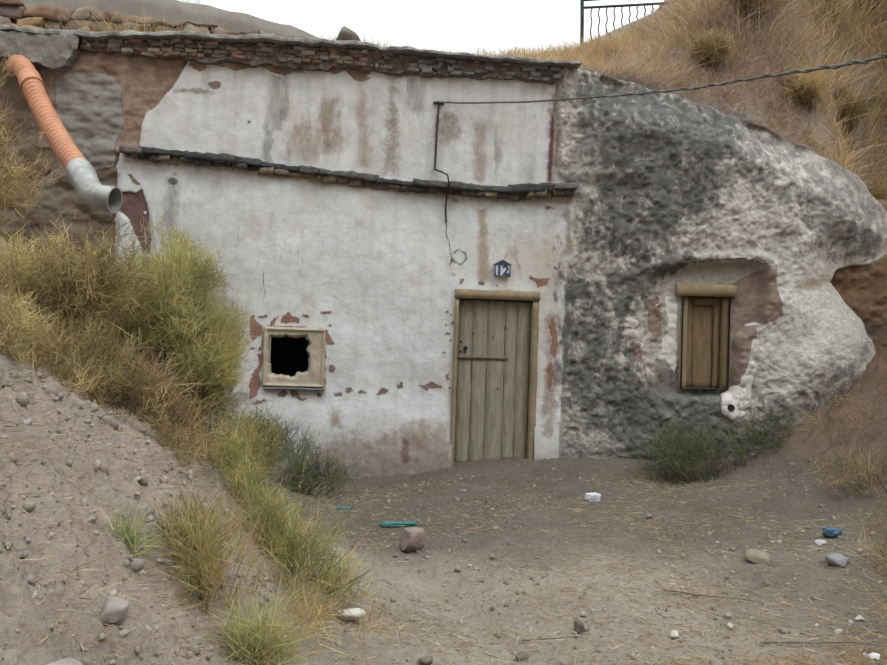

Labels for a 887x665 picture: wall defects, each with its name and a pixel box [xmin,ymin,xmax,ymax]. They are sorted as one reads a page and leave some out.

spalling [119,174,152,255]
peeling [529,266,558,287]
water stain [554,71,884,441]
peeling [249,313,322,404]
peeling [319,311,336,372]
peeling [420,374,451,391]
peeling [543,315,559,431]
peeling [646,294,678,374]
spalling [729,268,783,388]